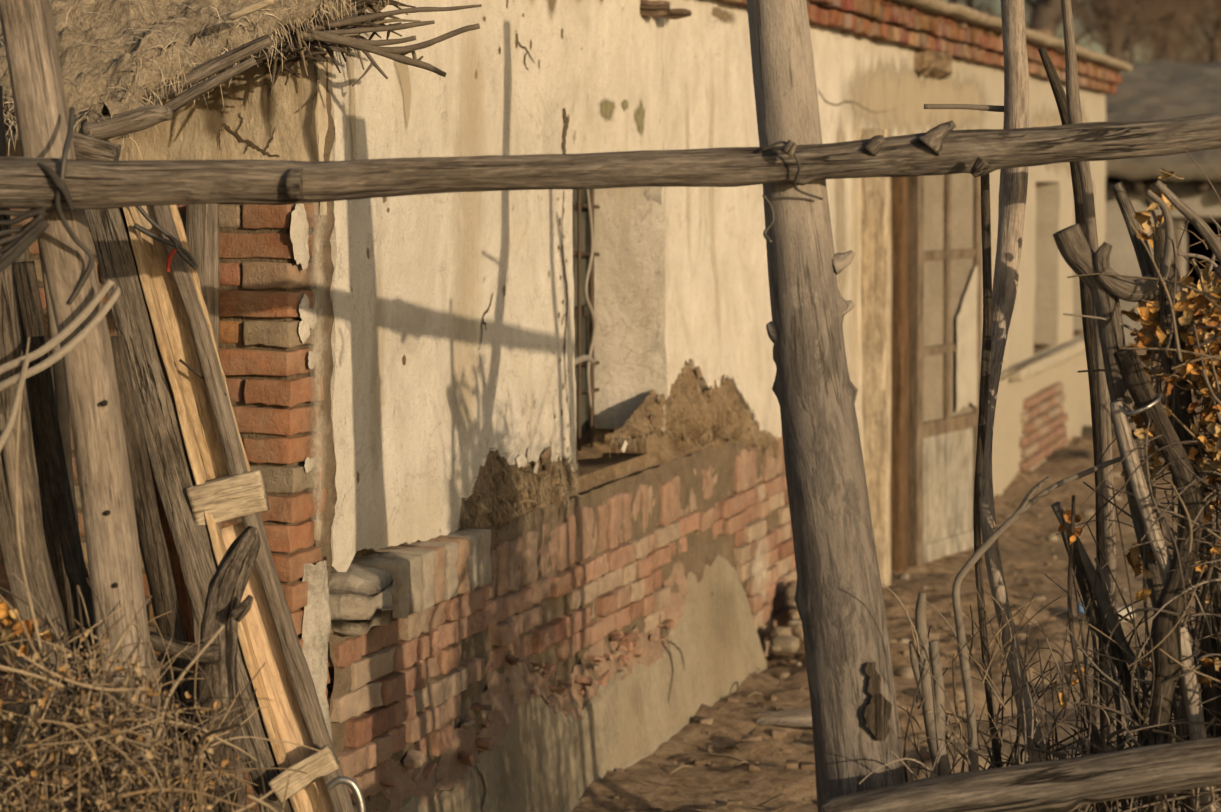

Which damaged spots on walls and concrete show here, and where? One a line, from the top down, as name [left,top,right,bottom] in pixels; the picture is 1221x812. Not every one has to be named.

water stain [713,8,733,22]
crack [218,113,279,157]
peeling [601,99,645,134]
peeling [302,241,310,271]
peeling [299,294,318,369]
flaking render [596,363,782,465]
peeling [304,457,316,473]
flaking render [456,446,581,547]
spalling [370,562,689,812]